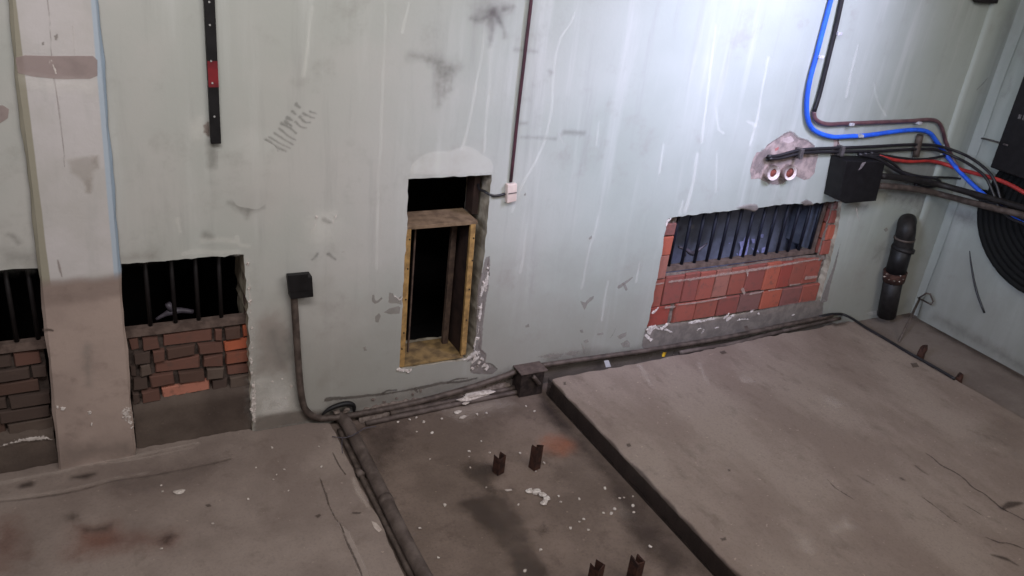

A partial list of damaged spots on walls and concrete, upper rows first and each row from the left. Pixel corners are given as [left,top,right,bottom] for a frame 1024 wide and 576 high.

spalling [750,131,840,185]
spalling [463,256,497,374]
crack [900,453,1024,565]